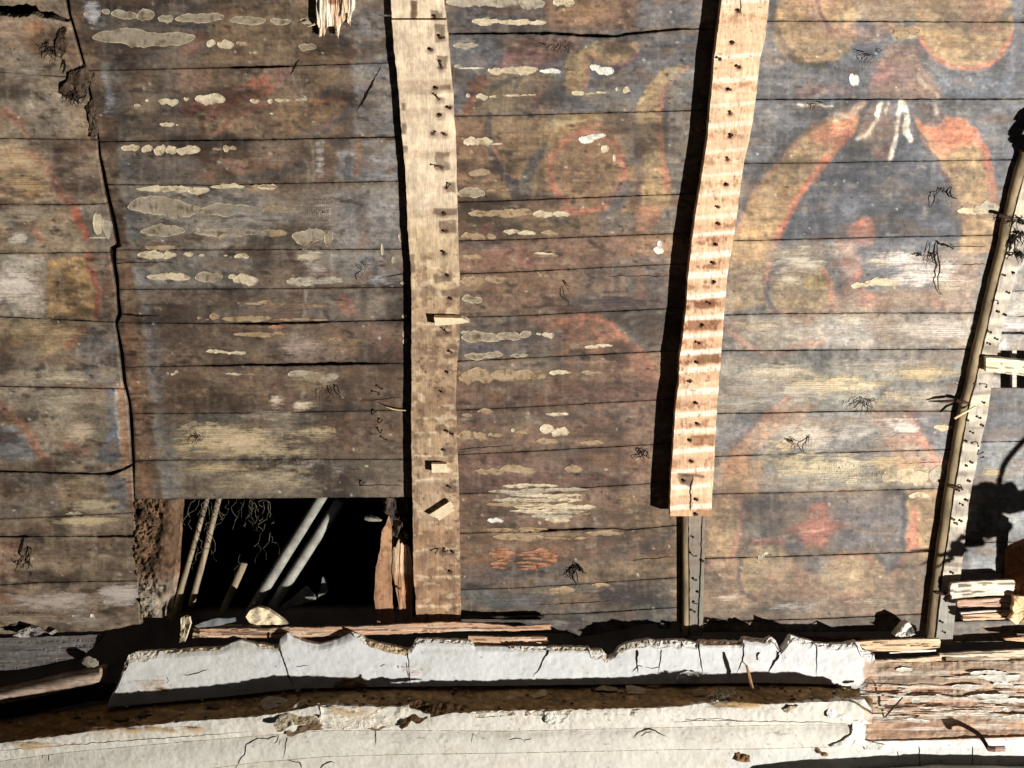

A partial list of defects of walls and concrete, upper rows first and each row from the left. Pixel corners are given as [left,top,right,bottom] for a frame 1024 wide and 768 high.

peeling [83,8,316,49]
peeling [446,0,575,26]
peeling [134,93,225,108]
peeling [121,144,237,156]
peeling [127,183,333,260]
peeling [458,168,570,240]
peeling [458,330,602,385]
peeling [474,464,624,570]
crack [633,650,662,673]
flaking render [509,635,874,663]
crack [737,644,781,673]
crack [6,731,334,768]